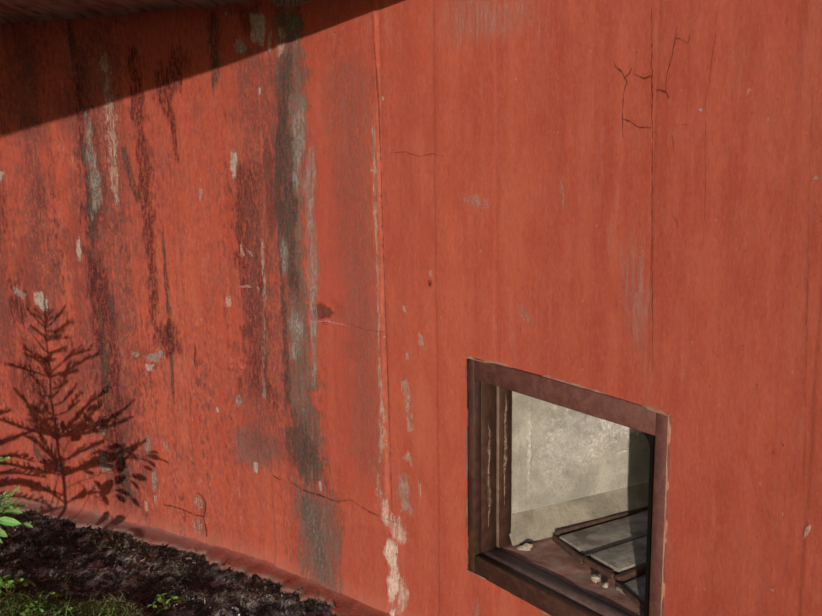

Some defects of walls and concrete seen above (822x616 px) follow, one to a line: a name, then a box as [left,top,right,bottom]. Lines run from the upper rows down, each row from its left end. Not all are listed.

leakage [60,20,191,514]
spalling [233,13,285,56]
leakage [231,5,344,592]
crack [273,476,394,522]
leakage [371,119,422,616]
crack [615,27,690,193]